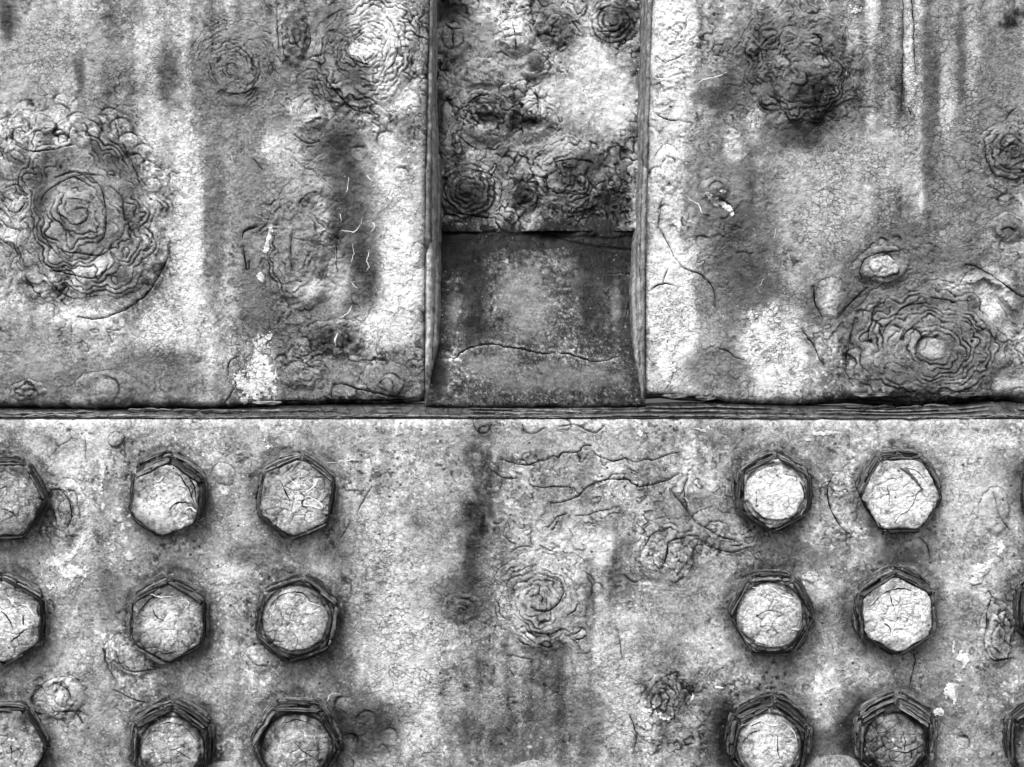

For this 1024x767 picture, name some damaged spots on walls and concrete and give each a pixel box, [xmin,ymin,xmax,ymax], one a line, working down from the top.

peeling [232,331,282,406]
crack [445,343,618,362]
crack [493,424,749,553]